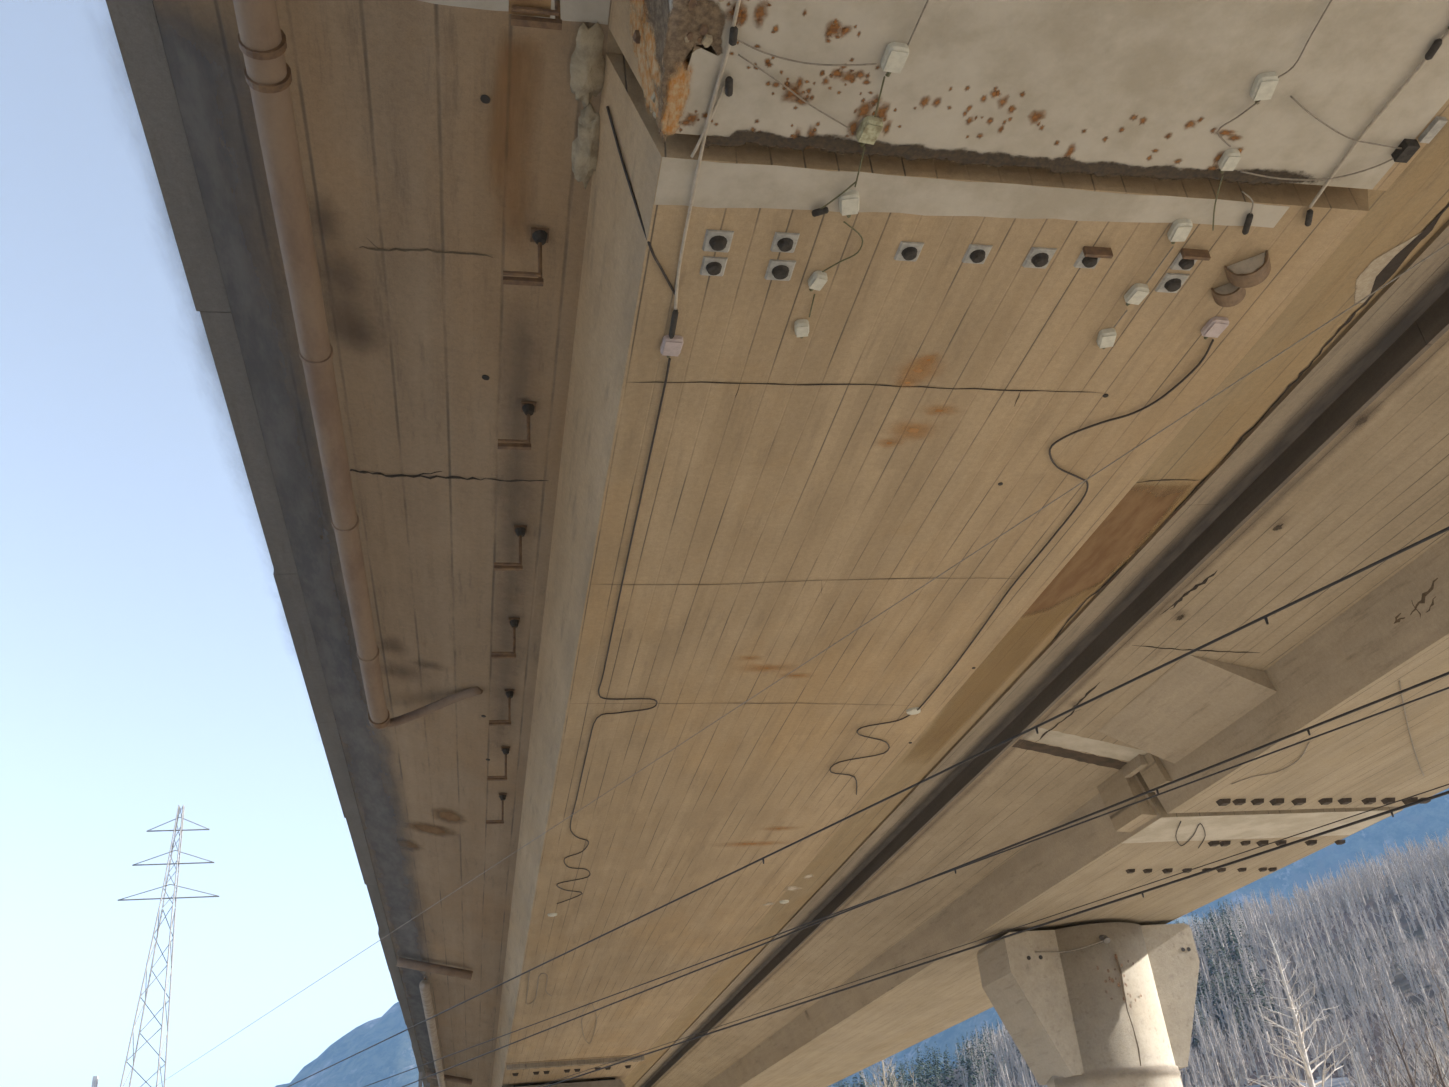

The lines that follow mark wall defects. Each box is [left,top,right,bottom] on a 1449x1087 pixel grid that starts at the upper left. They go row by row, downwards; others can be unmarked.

spalling [630,0,725,142]
corrosion [727,0,901,149]
corrosion [678,110,718,132]
corrosion [914,86,1044,138]
crack [359,238,493,258]
spalling [1354,232,1422,304]
crack [1136,204,1449,513]
crack [350,469,547,482]
crack [1053,562,1127,640]
crack [1394,578,1438,624]
crack [1116,955,1141,1066]